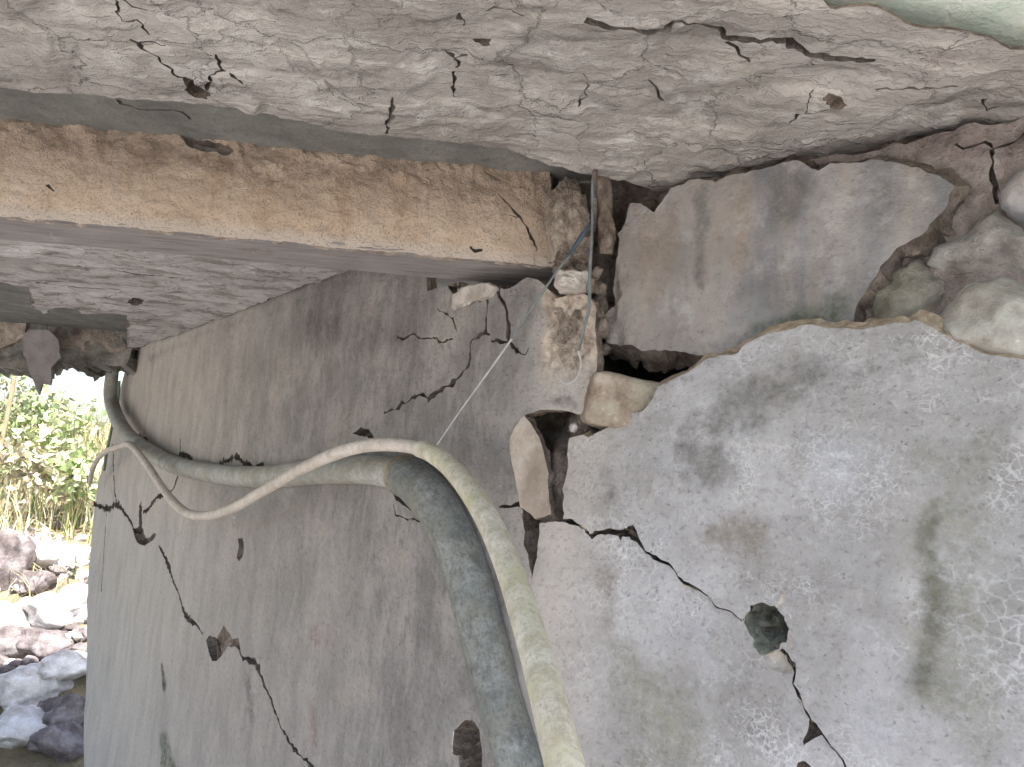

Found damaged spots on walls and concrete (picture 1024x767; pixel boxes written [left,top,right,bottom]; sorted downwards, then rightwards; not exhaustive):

crack [115,0,243,91]
crack [583,17,876,63]
crack [955,133,1024,204]
peeling [21,326,127,395]
crack [384,284,529,415]
spalling [554,305,591,371]
crack [94,439,203,635]
peeling [510,416,556,575]
crack [499,501,744,621]
spalling [206,626,244,661]
crack [242,655,314,767]
crack [781,648,846,767]